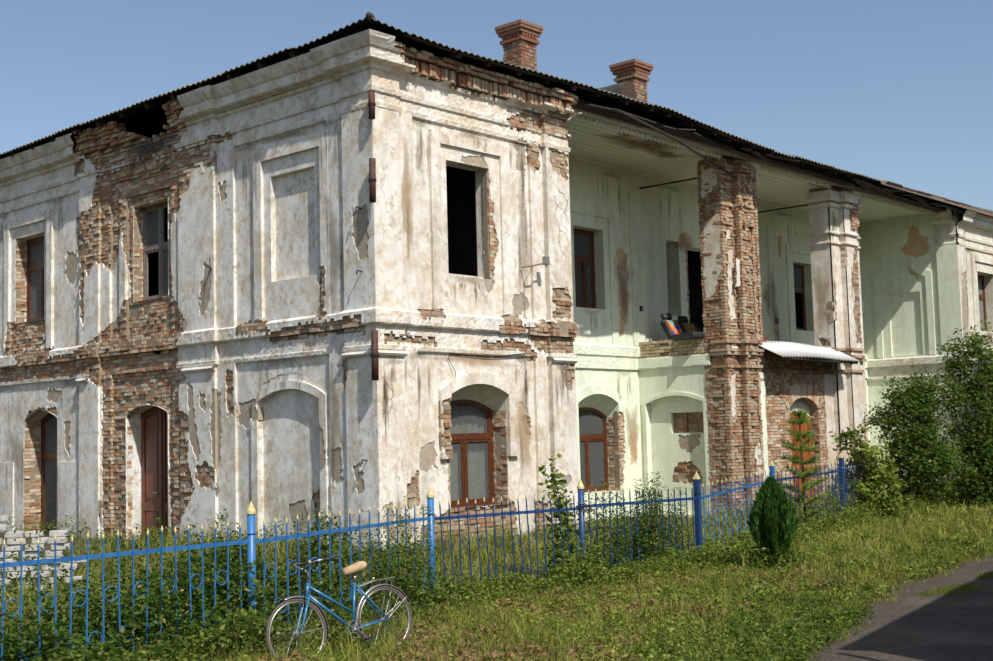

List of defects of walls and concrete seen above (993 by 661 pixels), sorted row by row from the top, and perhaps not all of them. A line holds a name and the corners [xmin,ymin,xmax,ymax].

flaking render [0,132,263,540]
flaking render [458,156,498,293]
water stain [617,268,630,316]
flaking render [673,158,829,517]
peeling [900,221,931,279]
flaking render [385,502,397,544]
flaking render [407,397,452,509]
flaking render [421,410,517,550]